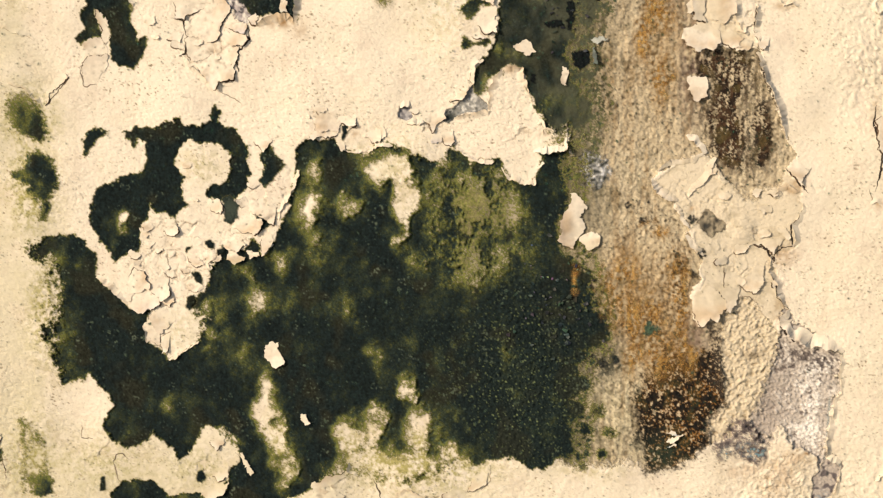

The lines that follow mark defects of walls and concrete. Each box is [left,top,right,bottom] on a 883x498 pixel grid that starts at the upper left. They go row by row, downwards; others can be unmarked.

water stain [4,91,60,223]
peeling [80,9,111,87]
peeling [128,0,302,103]
peeling [306,105,393,153]
corrosion [634,0,670,58]
corrosion [651,57,675,101]
peeling [96,170,300,360]
peeling [264,341,285,369]
water stain [23,0,620,498]
flaking render [396,0,846,498]
corrosion [605,254,698,377]
water stain [17,416,55,497]